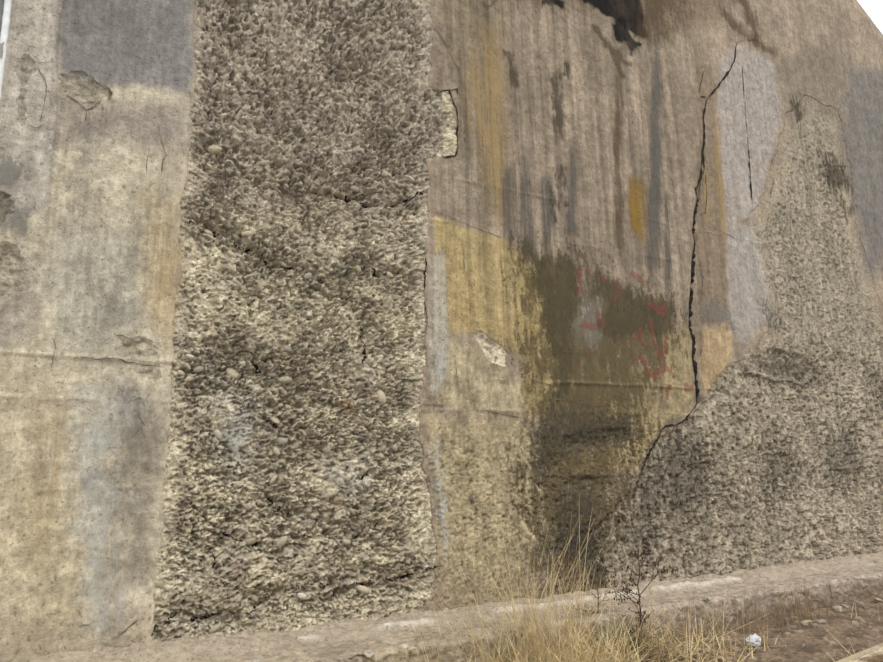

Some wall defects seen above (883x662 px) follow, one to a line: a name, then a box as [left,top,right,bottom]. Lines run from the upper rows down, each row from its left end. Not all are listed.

crack [24,61,113,128]
water stain [504,51,519,87]
water stain [593,0,666,77]
water stain [818,152,857,216]
crack [636,40,774,484]
crack [84,357,160,367]
spalling [115,0,458,642]
water stain [494,62,688,597]
spalling [591,95,883,588]